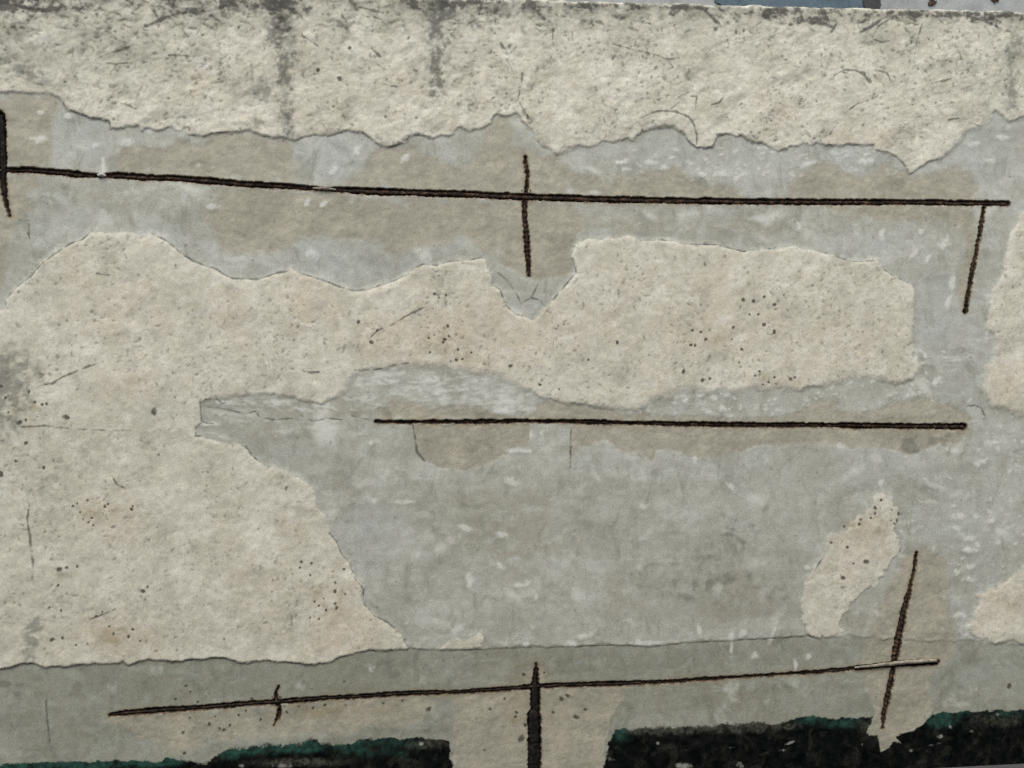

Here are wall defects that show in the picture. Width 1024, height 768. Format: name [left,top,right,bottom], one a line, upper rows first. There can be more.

flaking render [0,79,1024,656]
flaking render [0,538,1024,768]